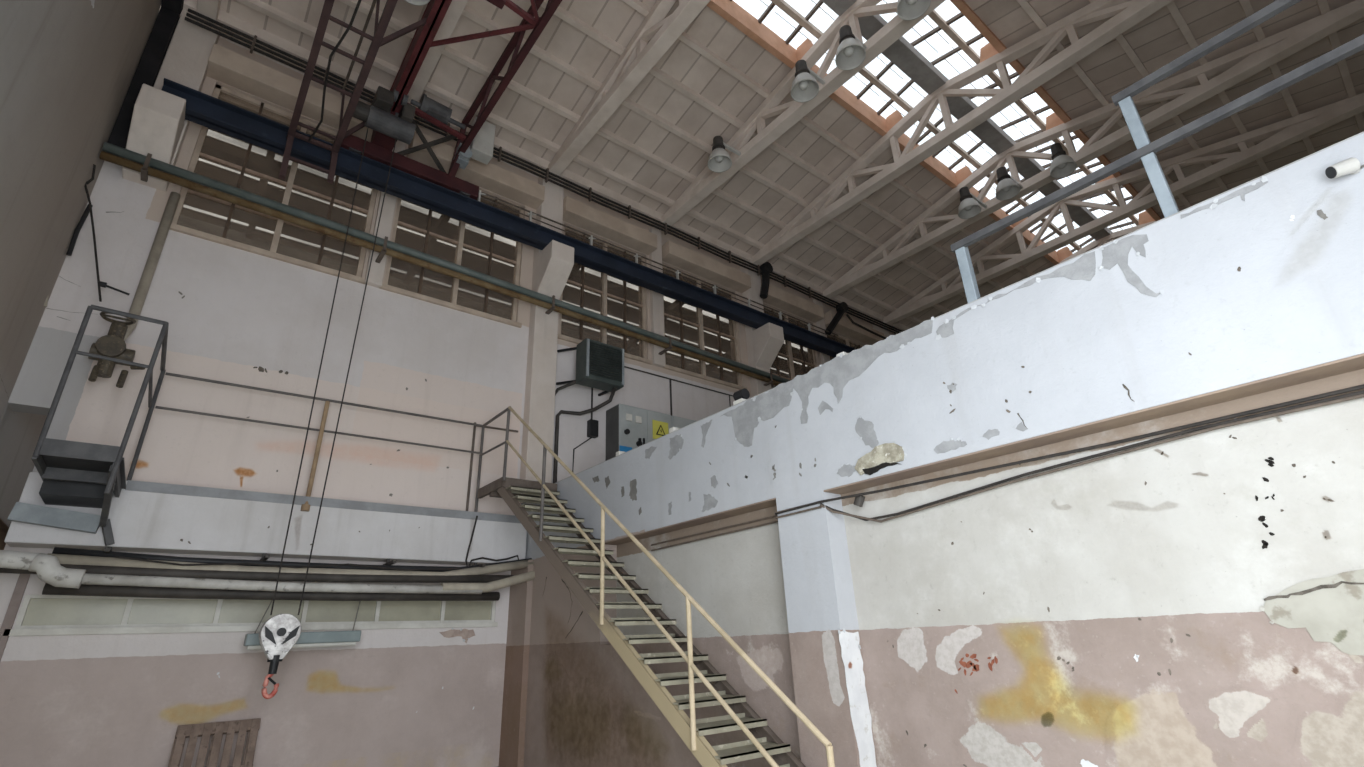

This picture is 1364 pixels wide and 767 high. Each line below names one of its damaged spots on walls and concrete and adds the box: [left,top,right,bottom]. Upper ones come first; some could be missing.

peeling [688,234,1164,512]
peeling [645,434,684,460]
flaking render [1255,457,1284,549]
peeling [887,613,987,709]
rust [958,653,998,676]
peeling [1080,669,1276,767]
peeling [1292,683,1364,767]